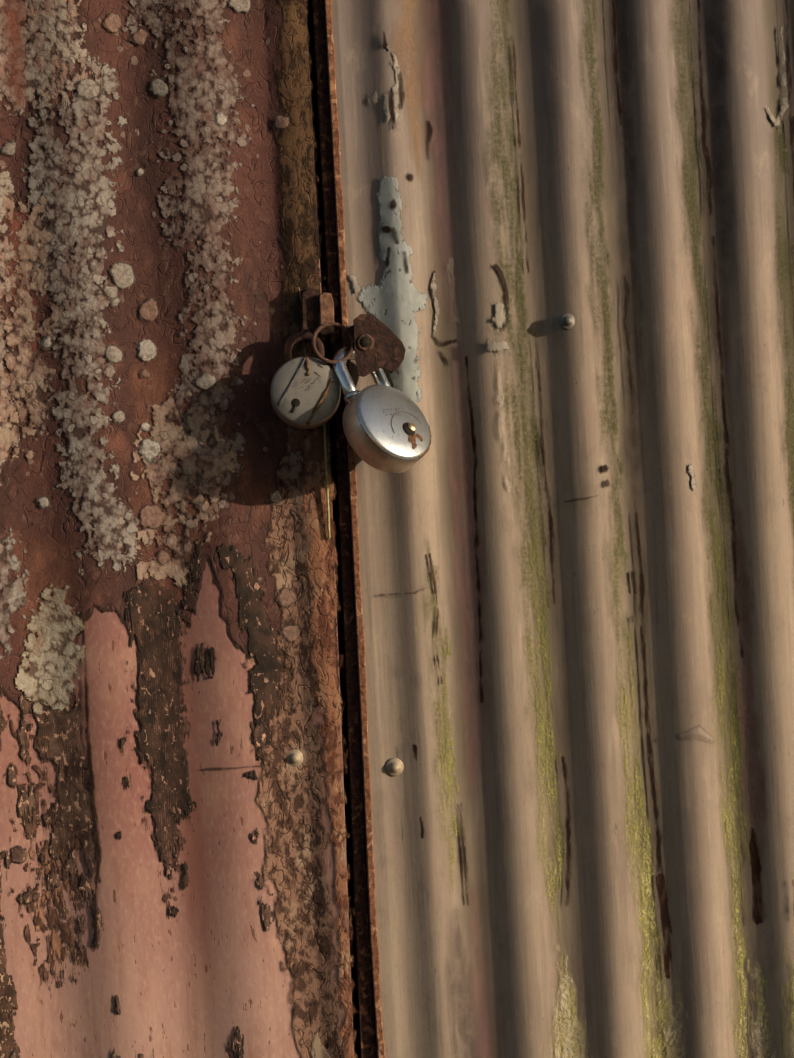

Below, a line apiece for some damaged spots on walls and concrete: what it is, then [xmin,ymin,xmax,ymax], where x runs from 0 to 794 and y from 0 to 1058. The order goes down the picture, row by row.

peeling [349,175,427,406]
rust [0,0,356,1058]
crack [379,553,443,684]
crack [429,271,483,703]
peeling [0,685,104,1058]
peeling [118,448,345,1058]
crack [410,744,418,760]
crack [417,817,425,839]
crack [459,803,469,905]
crack [631,511,672,979]
crack [749,828,762,925]